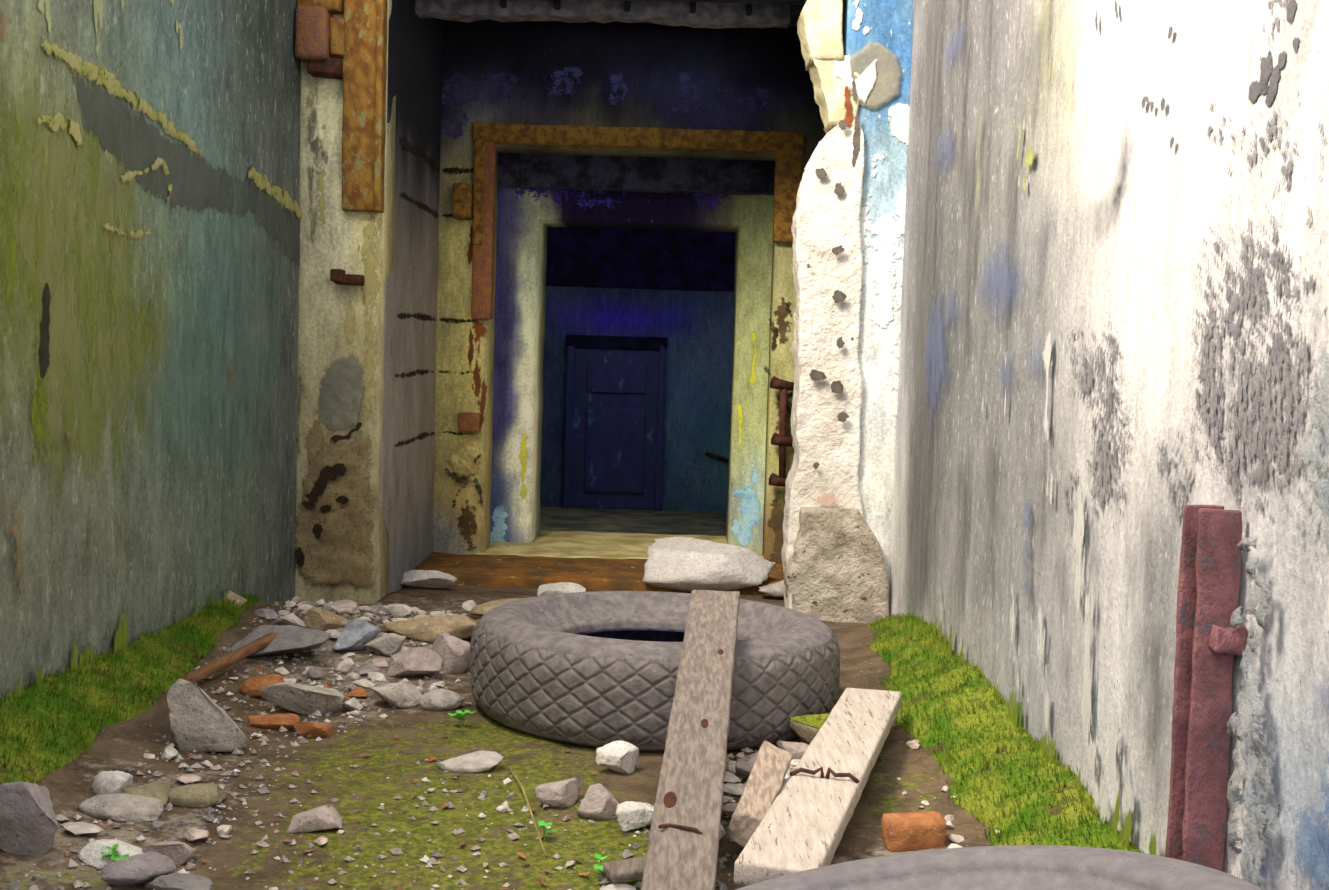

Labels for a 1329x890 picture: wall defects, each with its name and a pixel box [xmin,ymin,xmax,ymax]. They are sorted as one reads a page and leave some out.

flaking render [37,39,302,268]
peeling [545,66,583,96]
spalling [295,355,376,590]
rust [468,319,487,428]
spalling [781,0,910,624]